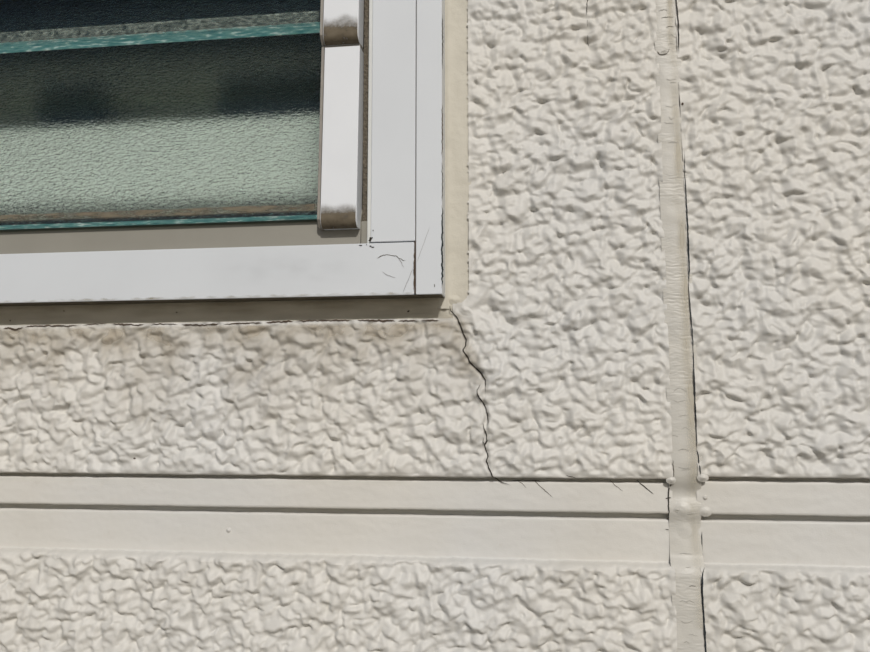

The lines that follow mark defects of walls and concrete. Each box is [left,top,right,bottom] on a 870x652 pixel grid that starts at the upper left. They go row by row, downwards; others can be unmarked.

crack [438,106,446,285]
crack [4,309,552,497]
crack [611,105,701,530]
crack [680,535,707,652]